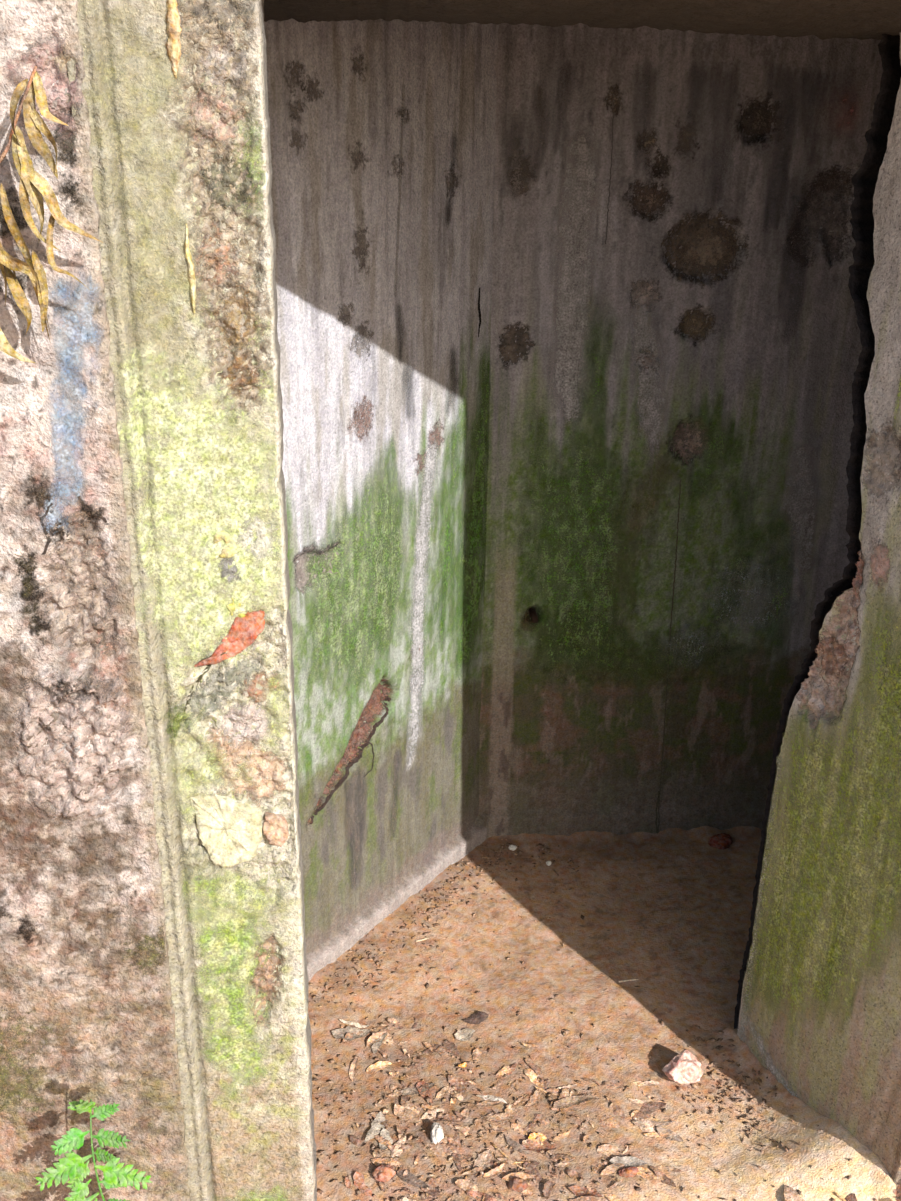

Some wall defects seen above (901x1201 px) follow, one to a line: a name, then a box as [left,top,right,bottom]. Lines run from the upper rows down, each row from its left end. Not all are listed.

water stain [374,442,398,629]
water stain [398,307,412,396]
water stain [393,363,491,825]
water stain [448,349,458,409]
water stain [633,295,665,452]
crack [734,34,901,1032]
water stain [740,738,822,1095]
peeling [745,550,901,1029]